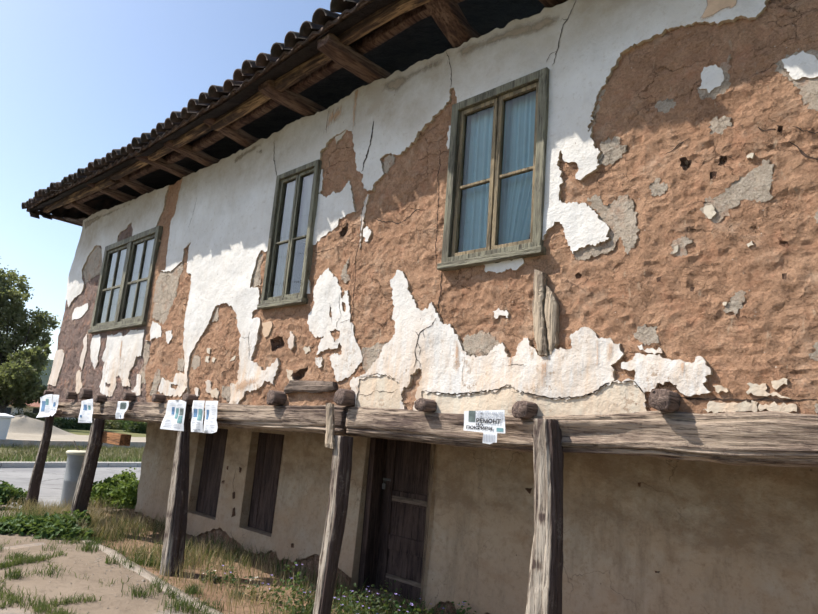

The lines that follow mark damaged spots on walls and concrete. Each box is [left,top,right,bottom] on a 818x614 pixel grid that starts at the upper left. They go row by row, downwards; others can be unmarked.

crack [547,1,576,64]
crack [361,121,374,172]
flaking render [240,0,818,416]
flaking render [47,178,241,403]
spalling [425,601,457,614]